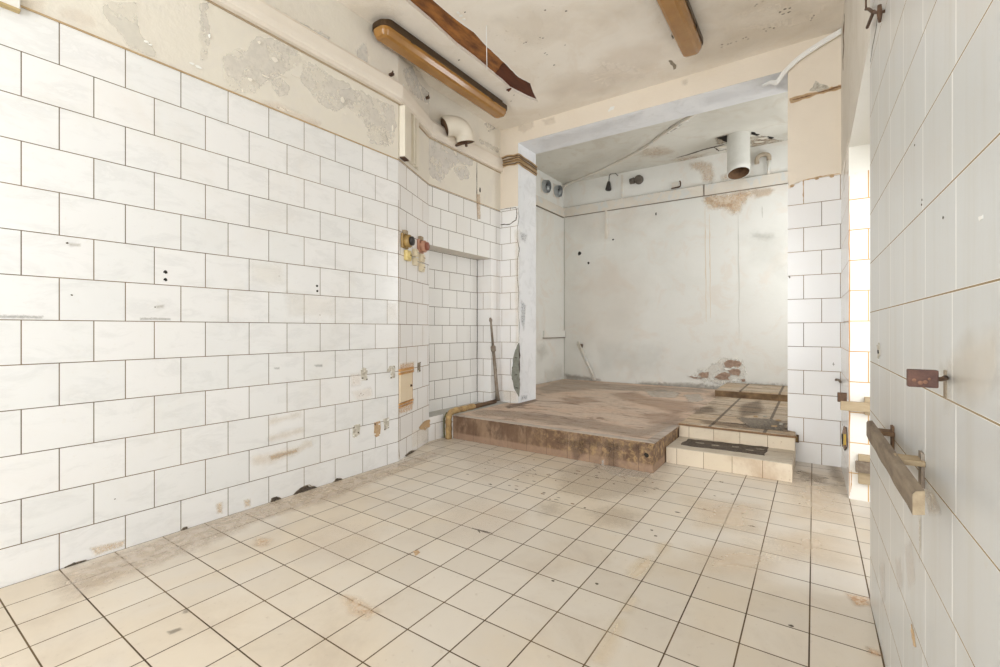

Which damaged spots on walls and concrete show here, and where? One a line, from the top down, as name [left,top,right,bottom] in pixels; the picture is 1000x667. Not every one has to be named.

flaking render [689,358,745,384]
spalling [374,418,389,437]